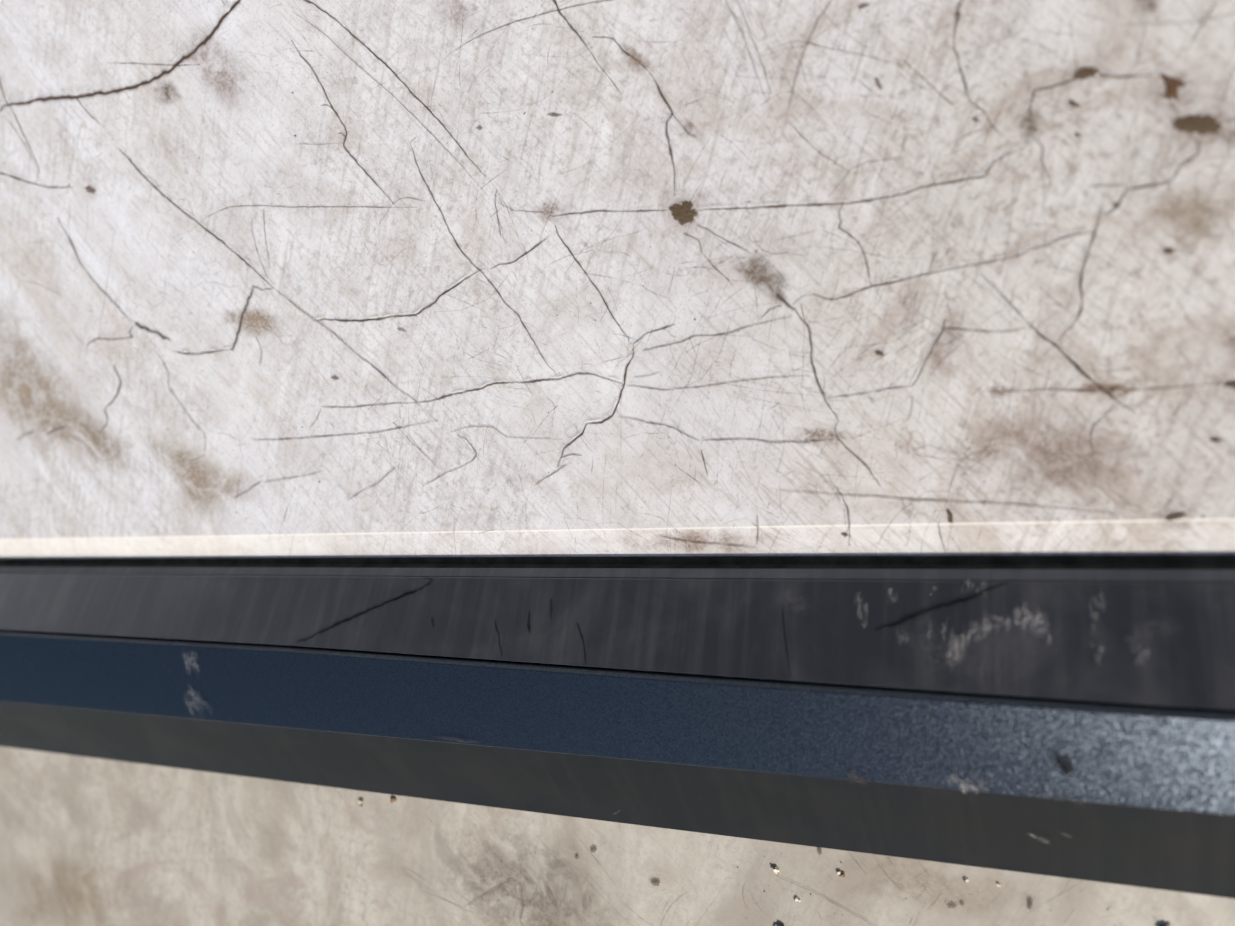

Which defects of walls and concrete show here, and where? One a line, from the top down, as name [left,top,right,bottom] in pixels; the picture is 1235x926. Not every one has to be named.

crack [0,0,240,144]
rust [1158,73,1187,100]
crack [0,173,65,188]
crack [90,156,271,355]
crack [265,0,1200,479]